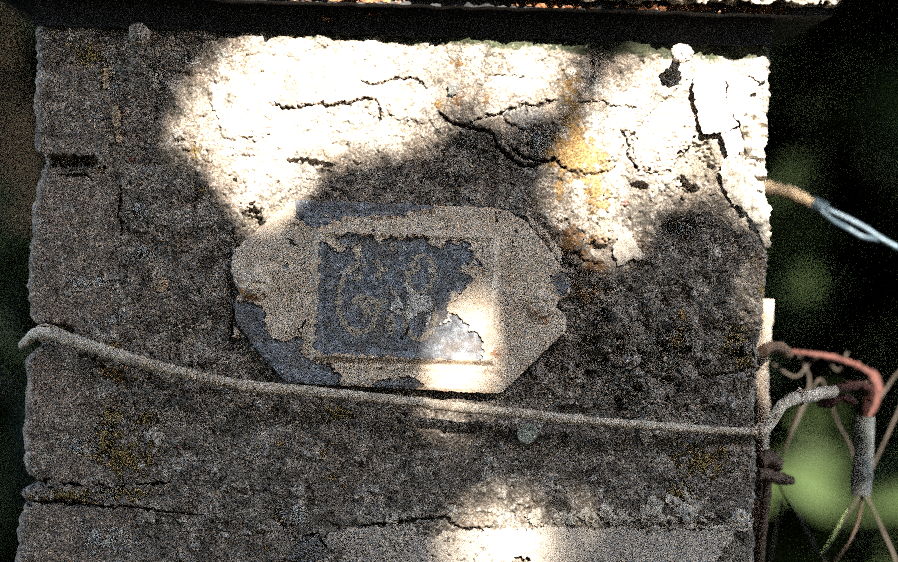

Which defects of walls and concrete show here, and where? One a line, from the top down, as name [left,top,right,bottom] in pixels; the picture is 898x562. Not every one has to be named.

crack [275,76,424,122]
crack [580,100,646,112]
crack [439,99,566,169]
crack [620,130,640,171]
peeling [675,69,772,248]
crack [35,481,206,517]
peeling [287,486,754,562]